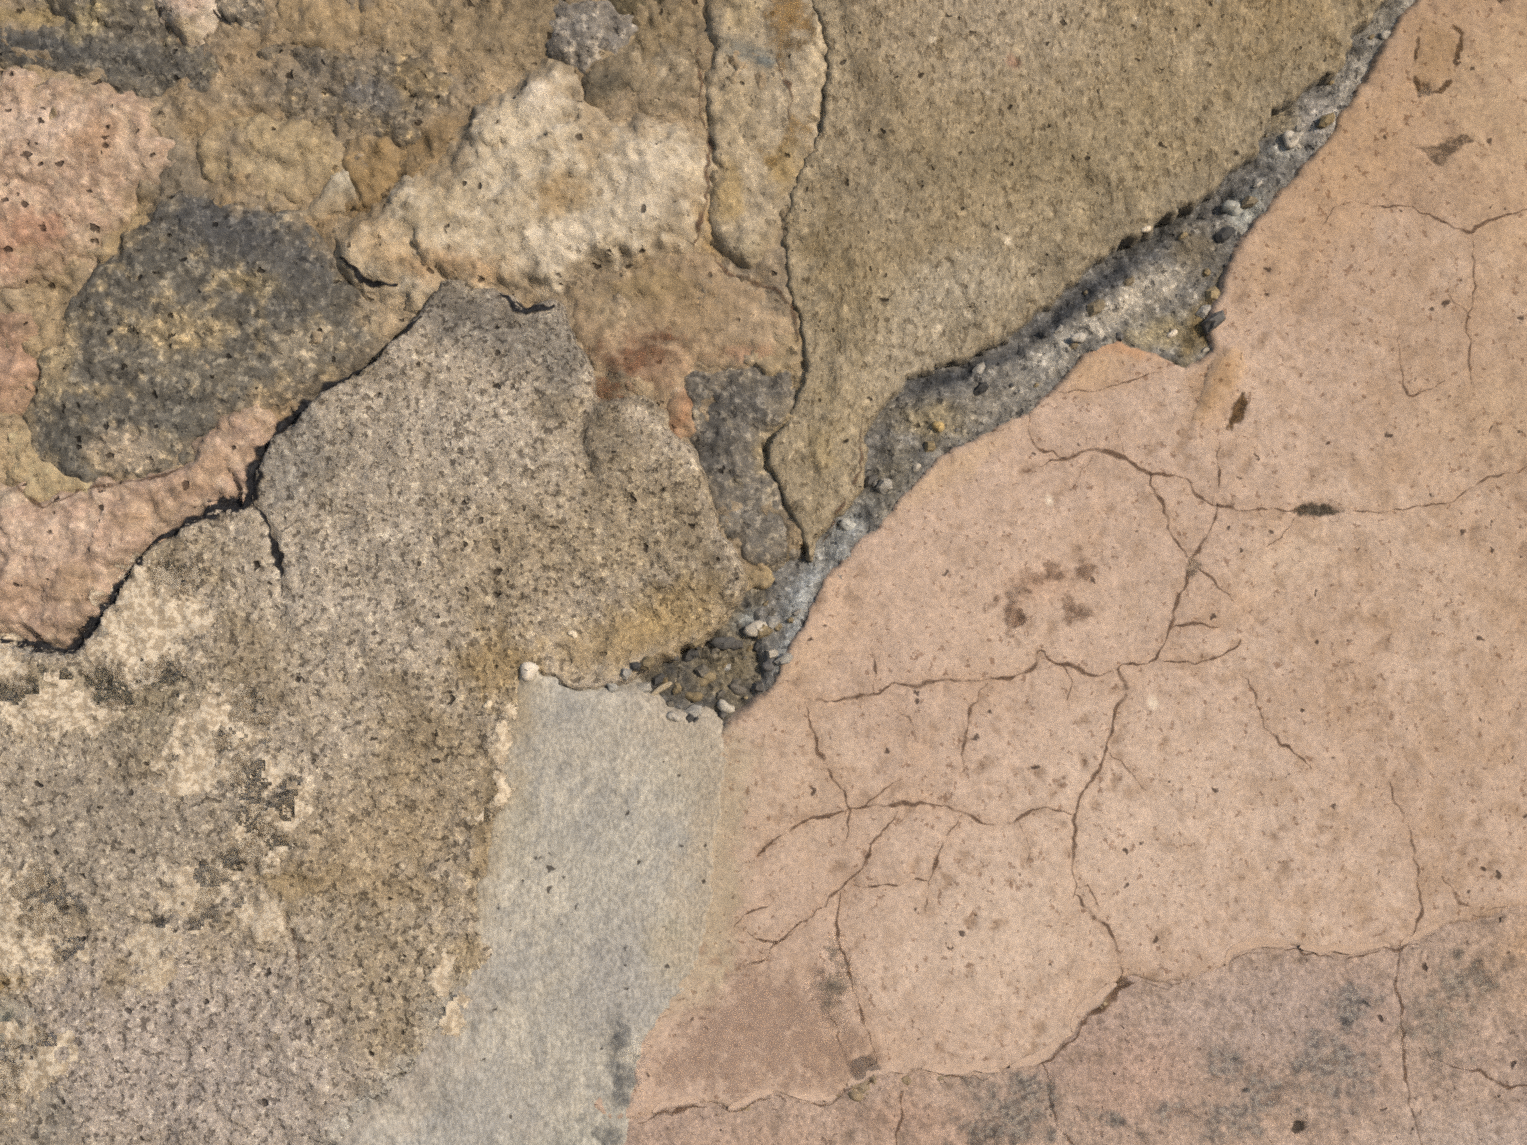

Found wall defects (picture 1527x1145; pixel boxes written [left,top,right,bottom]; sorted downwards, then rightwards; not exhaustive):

crack [339,257,398,288]
crack [499,293,555,314]
crack [694,47,798,342]
crack [1059,372,1157,393]
crack [1322,200,1527,397]
crack [0,316,422,655]
crack [1353,467,1526,513]
crack [734,410,1312,1065]
crack [895,1091,904,1145]
crack [1043,1064,1073,1144]
peeling [624,905,1527,1145]
crack [1390,781,1527,1145]